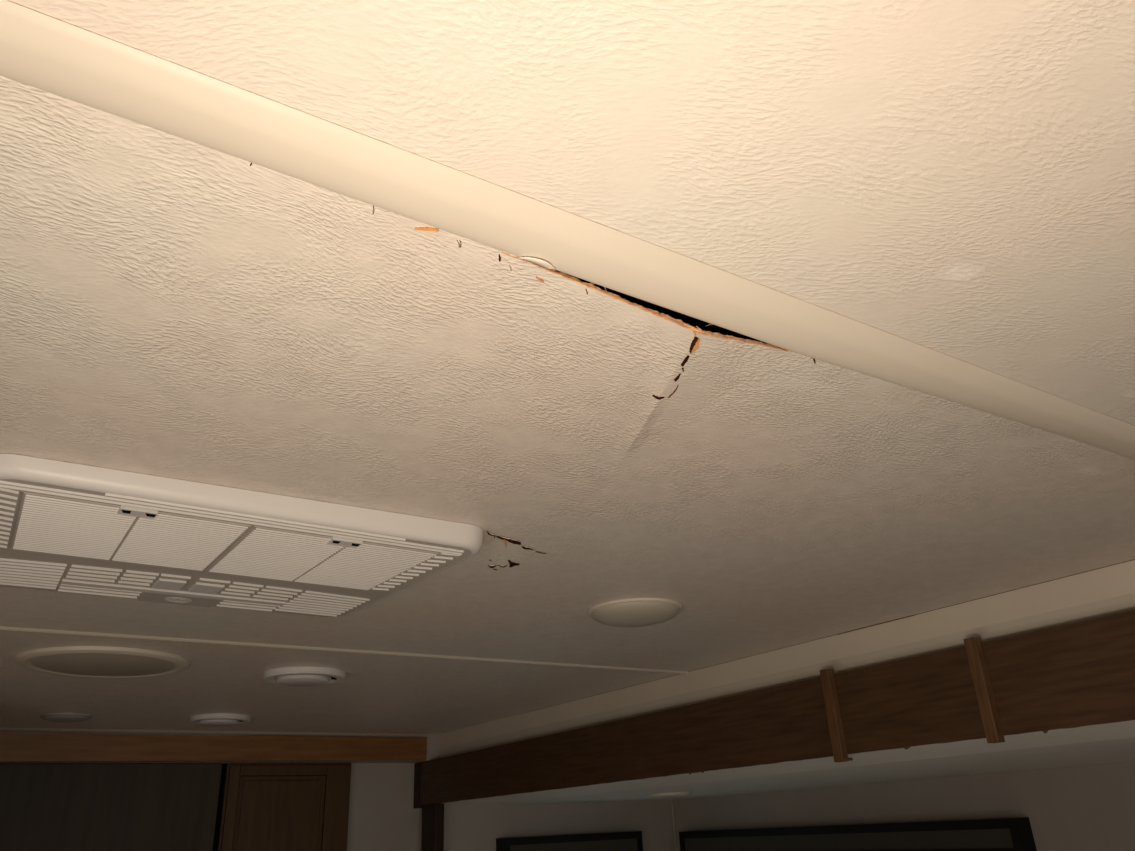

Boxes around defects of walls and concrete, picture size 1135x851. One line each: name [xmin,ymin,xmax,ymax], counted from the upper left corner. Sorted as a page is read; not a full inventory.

crack [652,337,700,400]
crack [487,531,546,570]